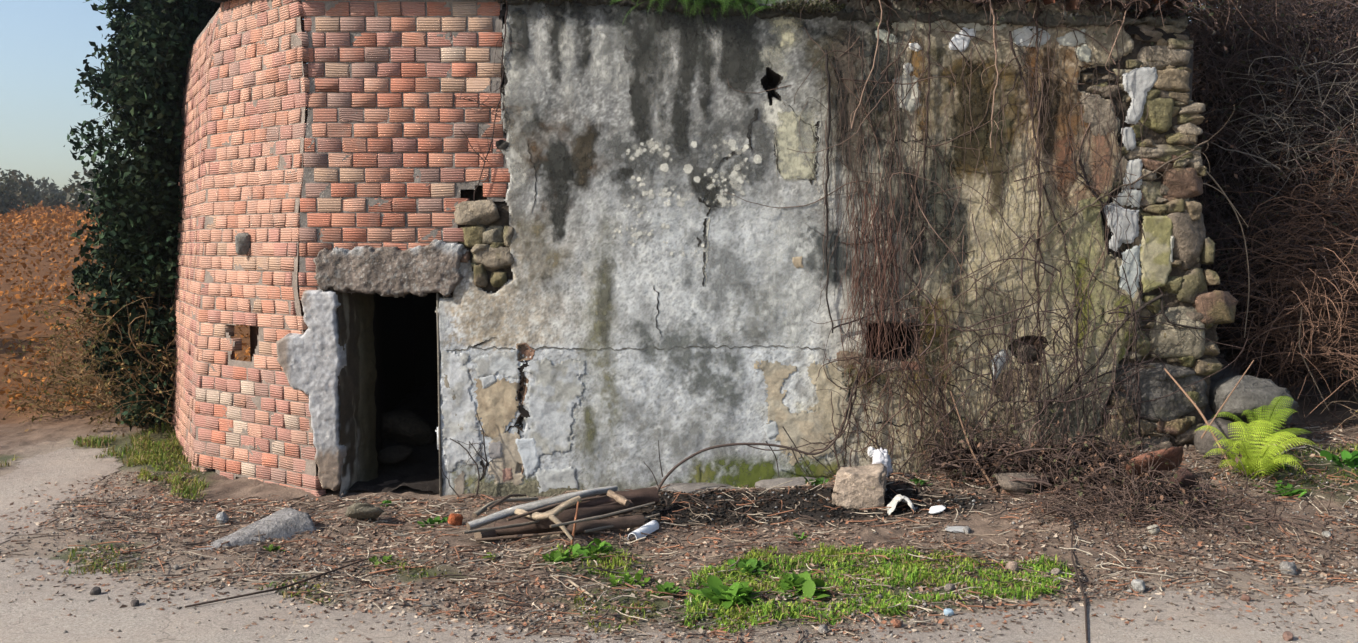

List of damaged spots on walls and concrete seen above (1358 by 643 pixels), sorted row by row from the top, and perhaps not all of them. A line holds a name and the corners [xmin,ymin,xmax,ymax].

leakage [503,0,1027,298]
peeling [440,343,586,497]
crack [446,287,824,480]
peeling [754,351,919,466]
crack [845,363,854,402]